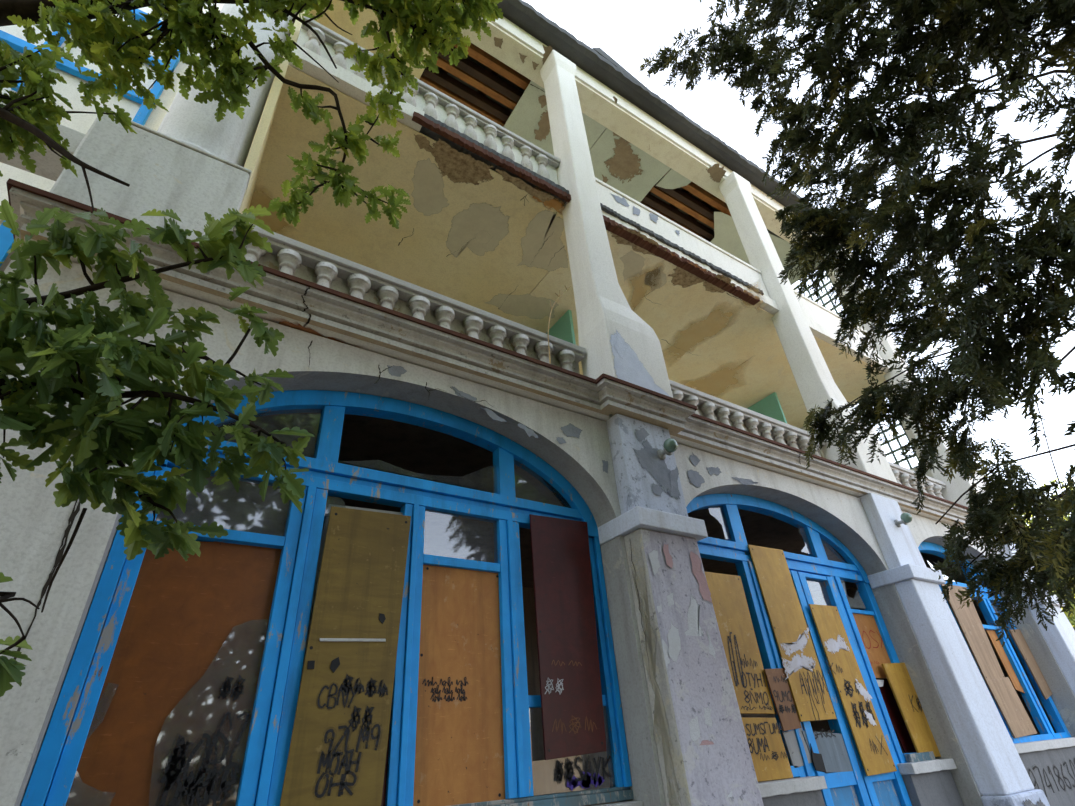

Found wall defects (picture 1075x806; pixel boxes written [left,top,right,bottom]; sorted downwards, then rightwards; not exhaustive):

peeling [411,114,569,271]
peeling [602,132,659,223]
peeling [706,164,727,182]
spalling [603,215,760,305]
peeling [556,423,582,444]